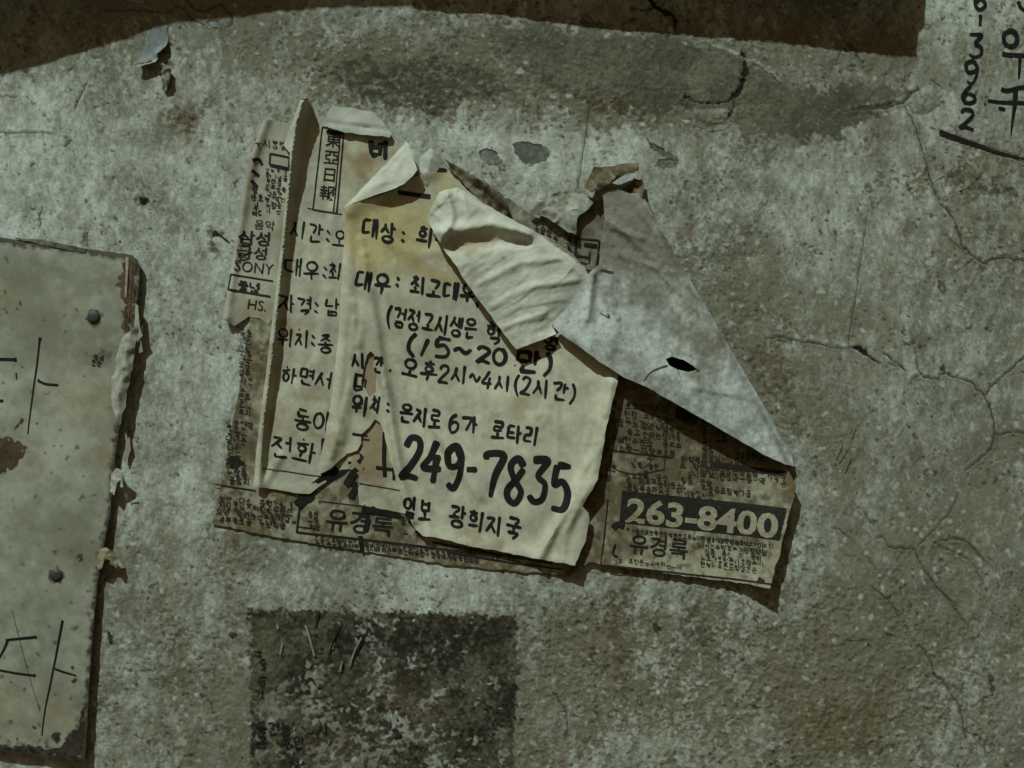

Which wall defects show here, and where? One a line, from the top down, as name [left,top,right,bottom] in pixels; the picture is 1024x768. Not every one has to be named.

peeling [134,21,171,93]
crack [684,51,749,119]
crack [843,80,1024,274]
crack [765,333,847,349]
rust [0,436,27,473]
crack [863,349,1024,626]
crack [917,646,977,740]